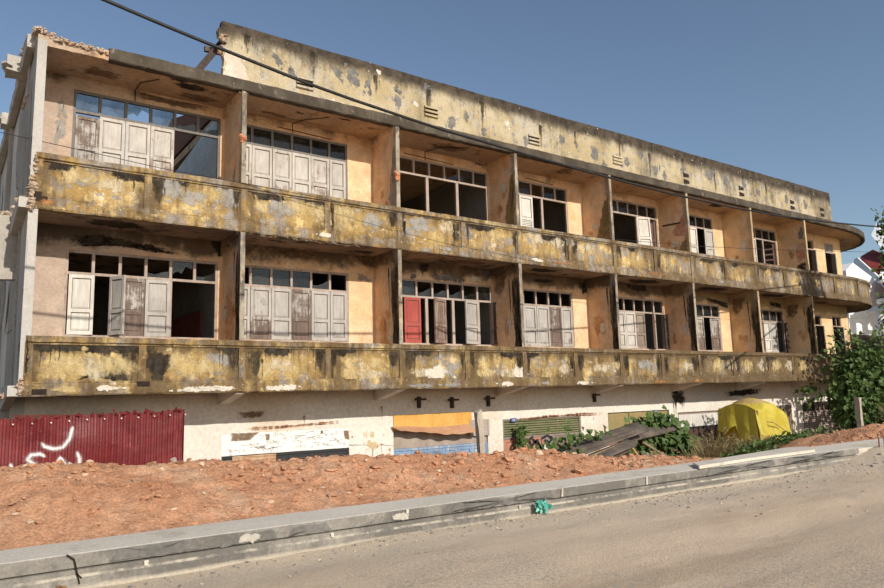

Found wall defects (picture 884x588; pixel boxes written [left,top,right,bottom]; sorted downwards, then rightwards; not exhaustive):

spalling [18,26,109,63]
flaking render [272,43,297,77]
flaking render [332,62,381,96]
flaking render [447,111,469,129]
water stain [252,192,286,202]
water stain [299,199,341,228]
water stain [389,212,406,237]
water stain [453,223,495,240]
water stain [542,235,577,253]
water stain [313,349,356,372]
peeling [409,354,460,388]
peeling [232,432,270,441]